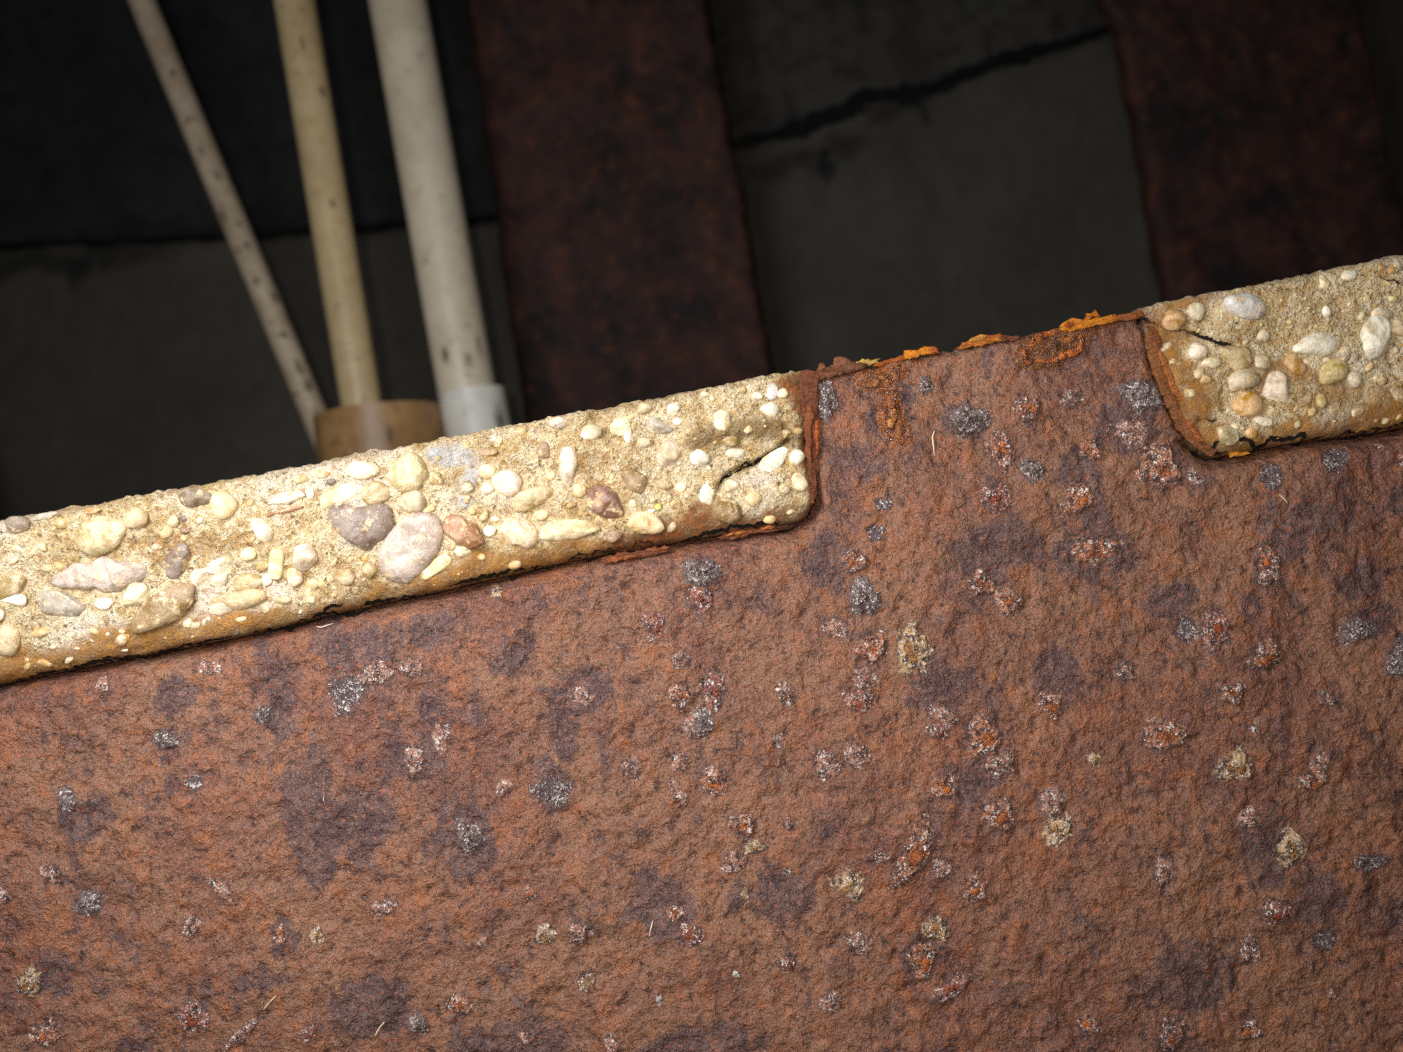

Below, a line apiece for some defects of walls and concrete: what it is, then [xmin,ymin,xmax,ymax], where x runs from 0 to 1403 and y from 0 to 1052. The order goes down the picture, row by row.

crack [733,25,1107,176]
rust [1079,296,1403,494]
rust [407,503,785,597]
rust [0,610,280,692]
rust [328,657,423,717]
rust [402,722,450,780]
rust [667,650,728,805]
rust [819,497,934,715]
rust [922,704,1015,779]
rust [828,812,988,905]
rust [1036,786,1076,849]
rust [904,915,971,1002]